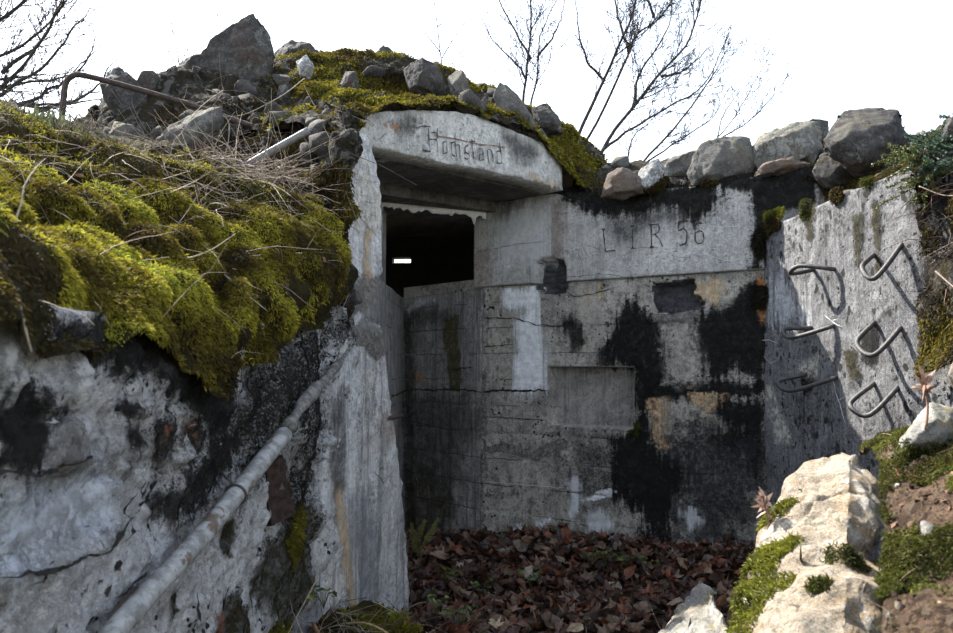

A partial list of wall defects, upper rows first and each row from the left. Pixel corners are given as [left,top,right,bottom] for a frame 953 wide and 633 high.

crack [483,245,747,327]
crack [372,367,547,402]
damp [688,508,700,530]